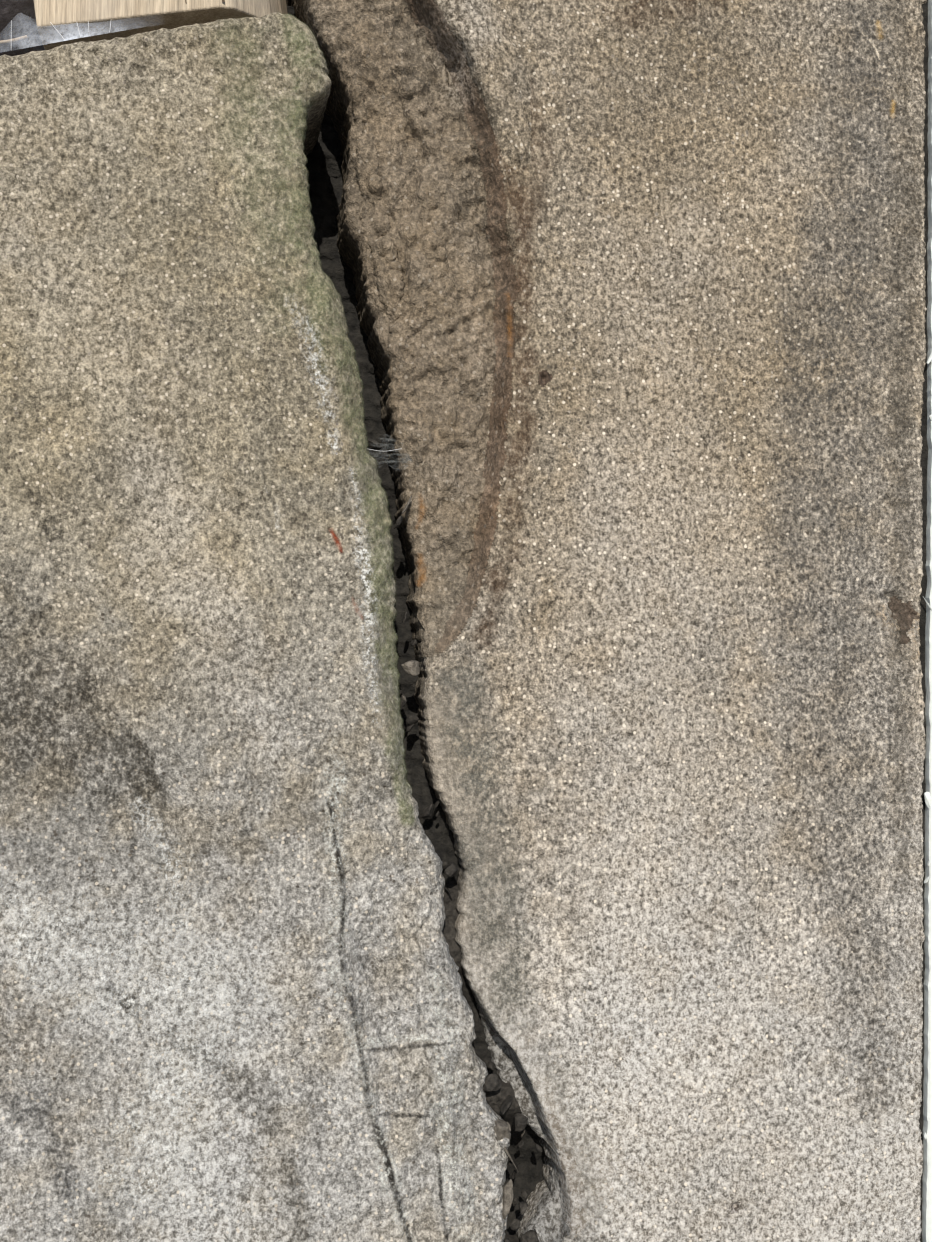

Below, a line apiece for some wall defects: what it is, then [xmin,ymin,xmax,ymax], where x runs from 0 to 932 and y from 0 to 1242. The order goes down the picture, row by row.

crack [287,6,296,18]
crack [305,112,555,1242]